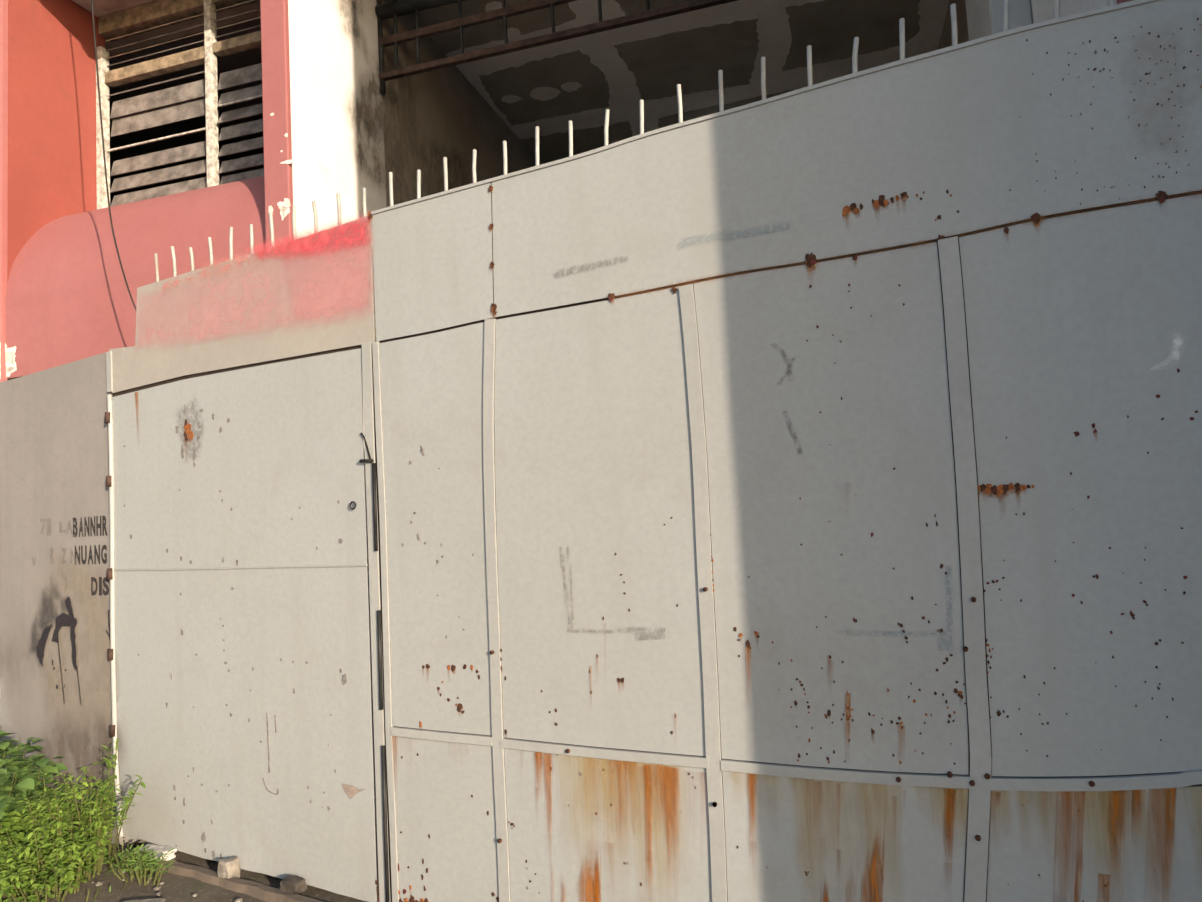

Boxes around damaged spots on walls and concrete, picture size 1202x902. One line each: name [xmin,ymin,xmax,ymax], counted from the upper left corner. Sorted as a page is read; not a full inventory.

corrosion [842,191,925,217]
corrosion [805,253,817,268]
peeling [0,343,17,378]
corrosion [183,419,194,441]
corrosion [977,482,1035,497]
corrosion [734,627,774,658]
corrosion [778,678,854,764]
corrosion [908,681,967,734]
corrosion [536,752,558,787]
corrosion [945,789,955,841]
corrosion [375,859,428,902]
corrosion [585,865,600,902]